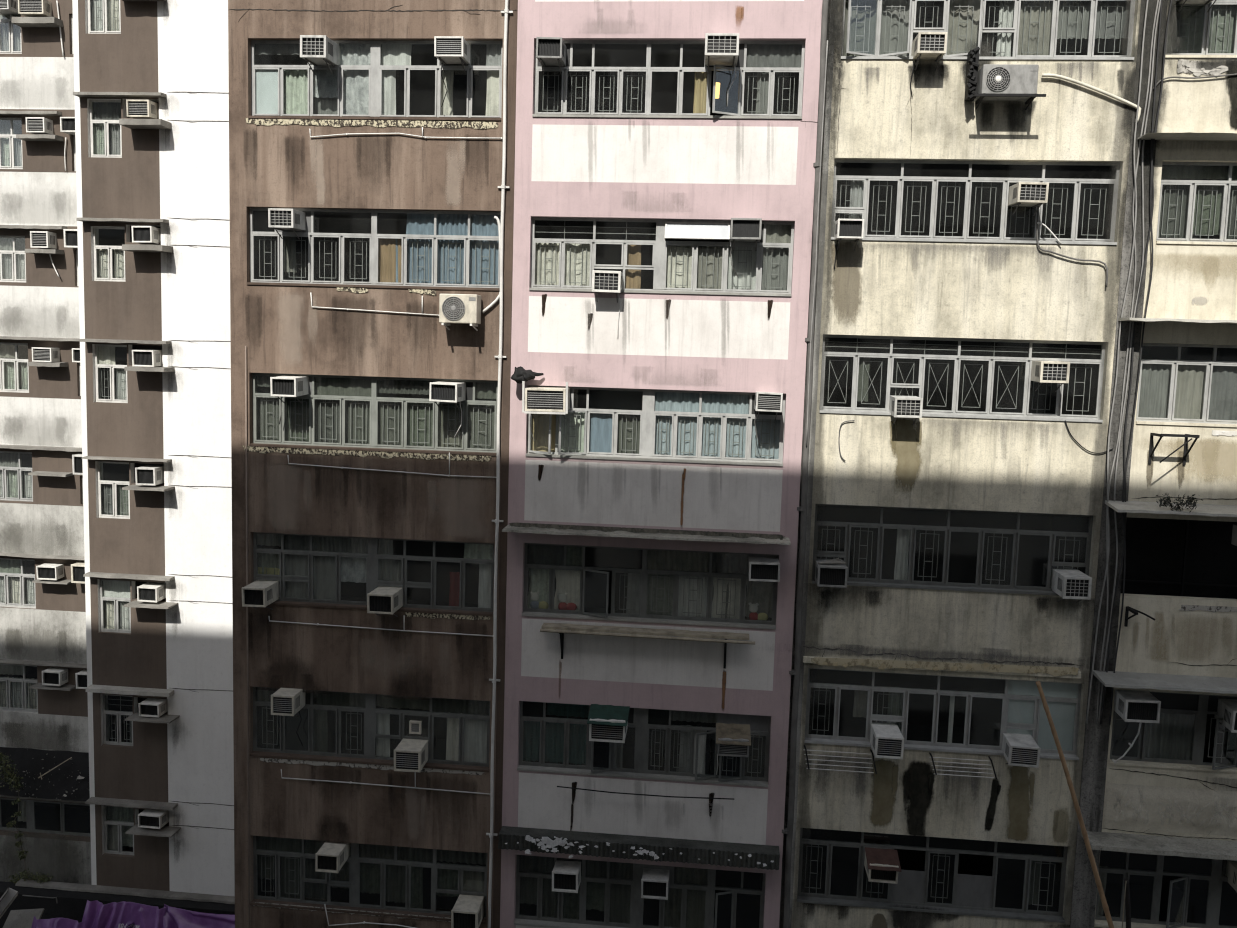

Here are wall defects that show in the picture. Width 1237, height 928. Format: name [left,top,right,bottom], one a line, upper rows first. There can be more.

damp [1199,58,1237,129]
damp [832,243,861,320]
damp [890,419,922,491]
damp [825,756,976,837]
damp [985,766,1035,841]
damp [870,906,959,928]